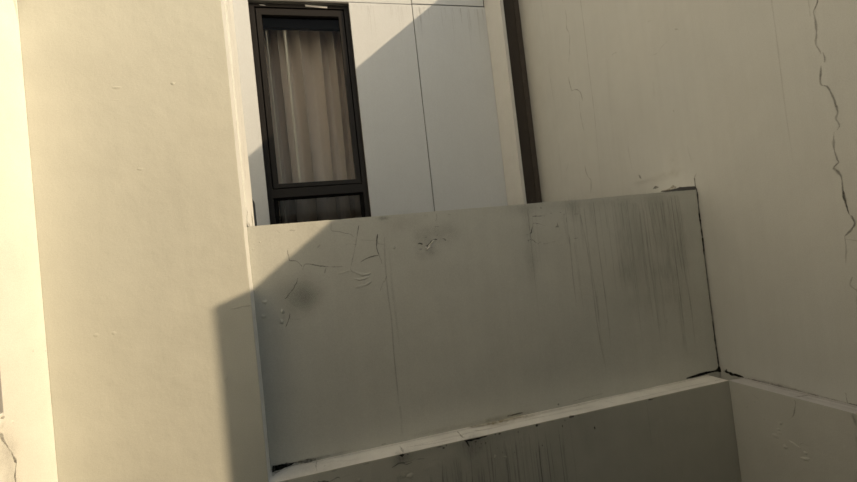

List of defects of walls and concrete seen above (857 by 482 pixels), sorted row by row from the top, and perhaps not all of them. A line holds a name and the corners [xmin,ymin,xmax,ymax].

water stain [272,459,316,472]